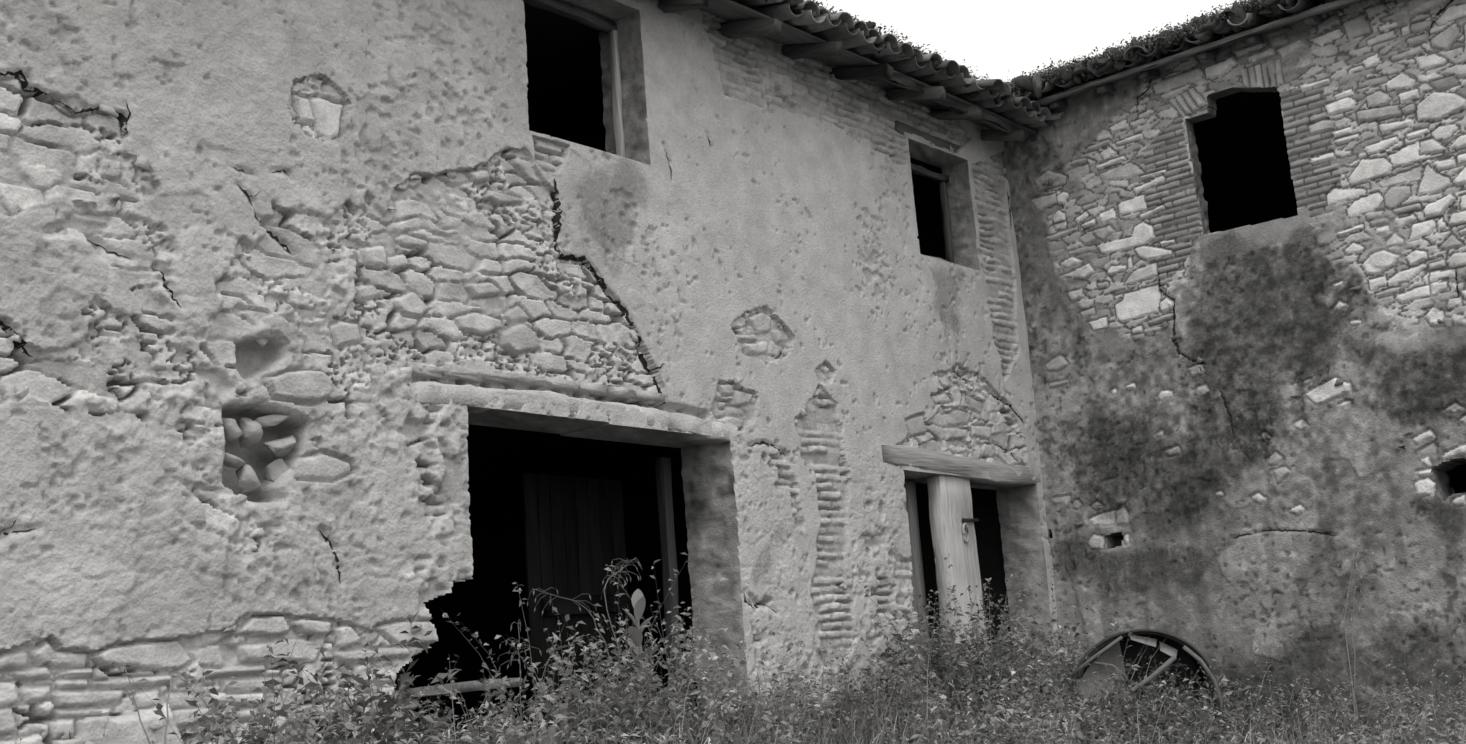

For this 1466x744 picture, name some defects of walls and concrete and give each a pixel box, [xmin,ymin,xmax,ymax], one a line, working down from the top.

crack [0,70,131,136]
peeling [0,76,162,216]
peeling [287,73,350,142]
peeling [699,9,971,172]
peeling [0,317,45,407]
peeling [328,135,667,408]
peeling [731,306,796,362]
peeling [896,151,1028,472]
peeling [231,494,247,505]
peeling [794,362,859,711]
peeling [0,615,433,744]